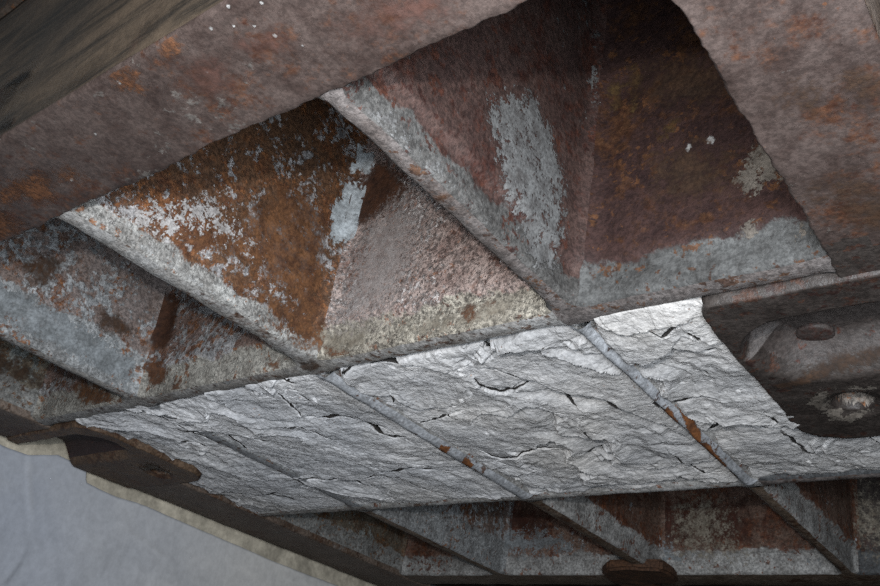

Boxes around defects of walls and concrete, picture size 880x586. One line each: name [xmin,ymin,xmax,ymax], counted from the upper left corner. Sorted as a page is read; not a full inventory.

rust [23,253,64,288]
rust [180,184,349,370]
rust [150,294,178,348]
rust [461,305,478,323]
crack [649,326,713,351]
rust [141,359,180,390]
crack [342,357,414,375]
crack [474,340,529,392]
crack [124,379,450,448]
crack [486,431,603,476]
rust [661,406,736,477]
crack [762,415,812,454]